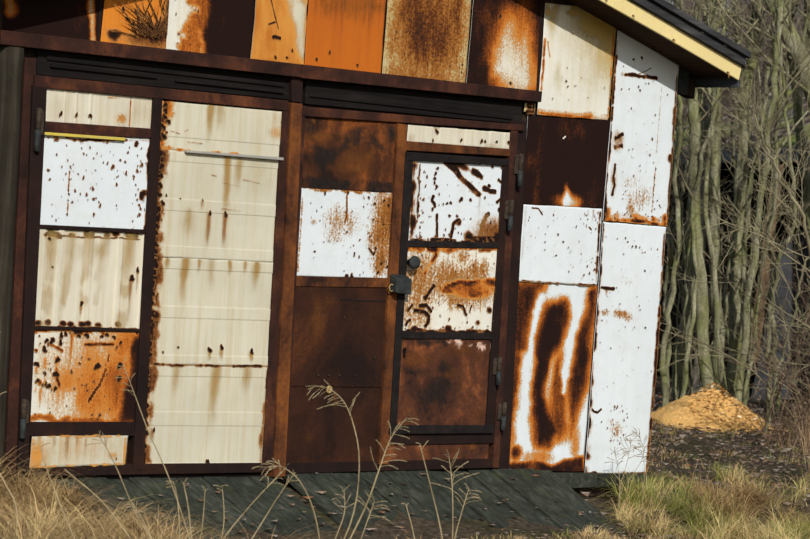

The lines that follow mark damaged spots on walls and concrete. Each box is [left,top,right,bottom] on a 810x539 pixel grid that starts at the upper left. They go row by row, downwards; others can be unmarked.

corrosion [176,0,254,58]
corrosion [383,0,550,91]
corrosion [44,183,140,241]
corrosion [80,139,139,204]
corrosion [144,101,221,464]
corrosion [297,177,393,278]
corrosion [403,161,499,333]
corrosion [509,33,678,474]
corrosion [30,319,139,422]
corrosion [232,348,267,390]
corrosion [30,434,126,468]